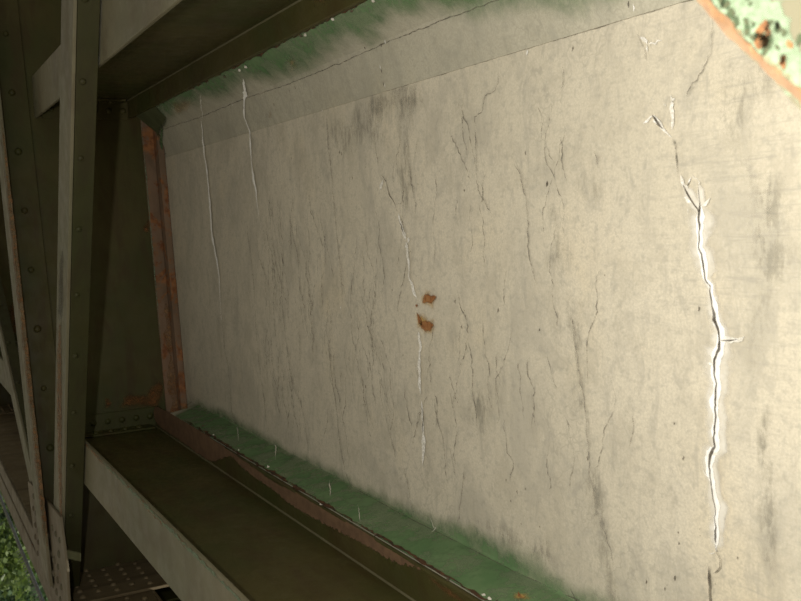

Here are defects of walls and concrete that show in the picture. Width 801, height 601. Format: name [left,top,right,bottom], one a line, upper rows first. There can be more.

rust [697,0,801,104]
crack [200,95,222,320]
crack [242,79,498,476]
rust [415,294,436,331]
crack [644,97,744,601]